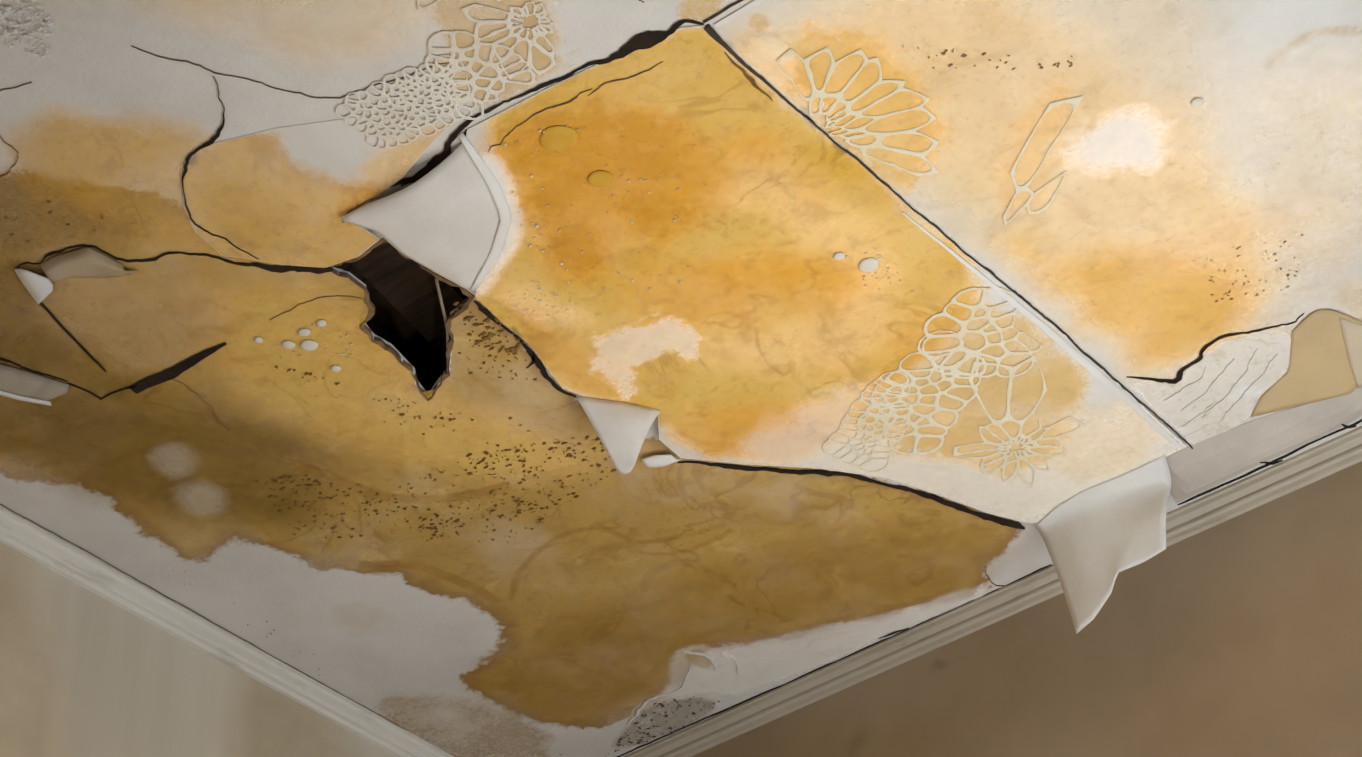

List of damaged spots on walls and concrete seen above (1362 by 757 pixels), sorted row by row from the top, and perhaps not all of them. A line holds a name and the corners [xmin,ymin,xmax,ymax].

crack [16,45,449,320]
crack [342,0,704,223]
leakage [855,13,1119,178]
leakage [1081,173,1304,343]
crack [0,302,230,432]
leakage [0,2,1017,757]
crack [474,300,577,398]
crack [1126,313,1304,384]
crack [1178,419,1362,505]